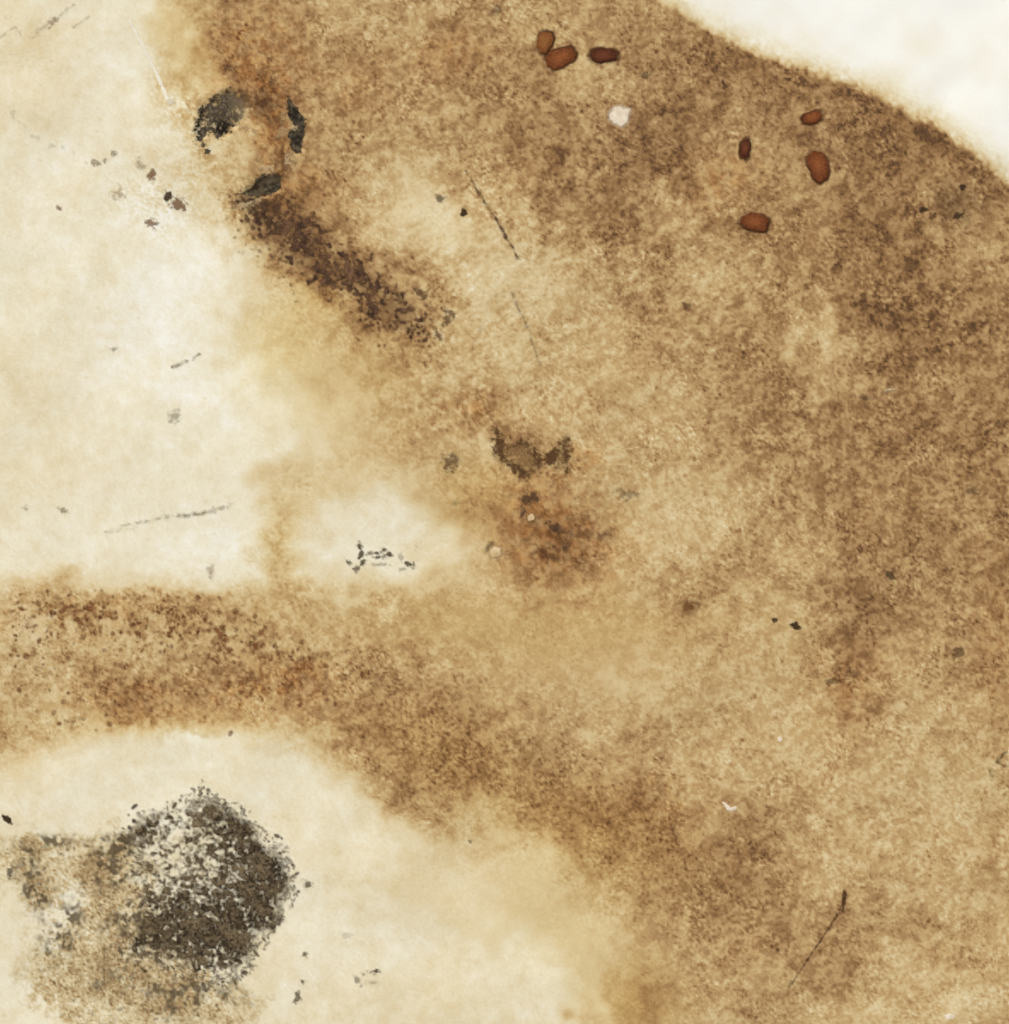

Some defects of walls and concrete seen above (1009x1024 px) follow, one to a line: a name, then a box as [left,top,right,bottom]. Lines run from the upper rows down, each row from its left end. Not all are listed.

rust [536,30,619,70]
rust [800,110,822,125]
rust [738,137,751,160]
rust [805,151,830,184]
water stain [244,198,322,257]
rust [740,212,770,233]
water stain [319,263,336,289]
water stain [332,251,382,320]
water stain [0,787,311,1024]